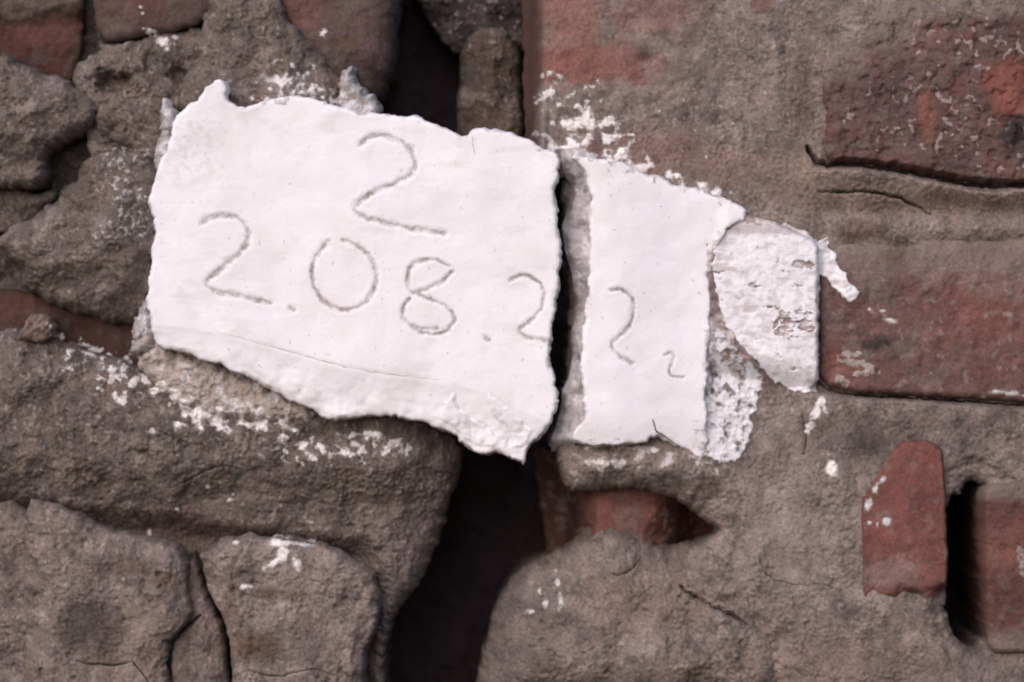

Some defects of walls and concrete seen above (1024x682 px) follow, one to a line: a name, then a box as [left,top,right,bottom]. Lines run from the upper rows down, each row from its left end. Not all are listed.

crack [804,147,1024,215]
crack [515,148,591,477]
flaking render [702,219,860,463]
spalling [834,350,881,387]